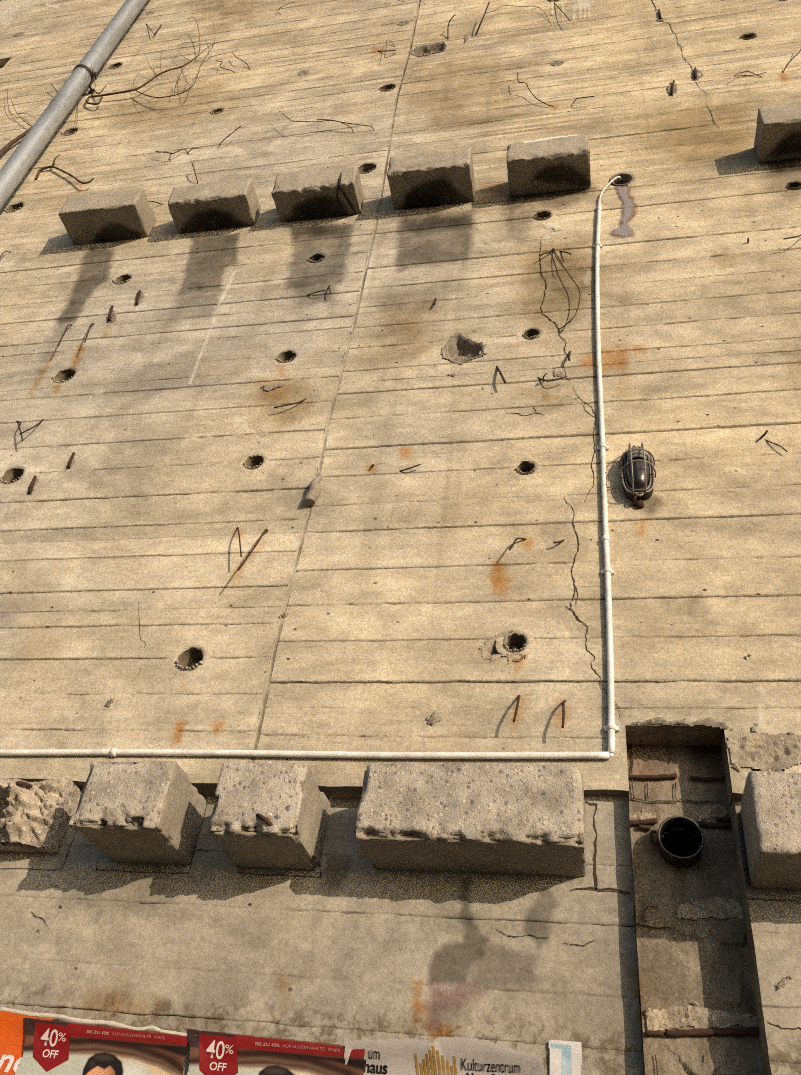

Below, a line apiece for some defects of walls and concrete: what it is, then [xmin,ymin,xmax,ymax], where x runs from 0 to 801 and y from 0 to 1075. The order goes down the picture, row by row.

spalling [441,332,487,377]
crack [539,222,624,722]
spalling [479,626,535,664]
spalling [631,717,801,781]
spalling [0,778,82,854]
peeling [636,896,746,947]
spalling [645,1001,759,1075]